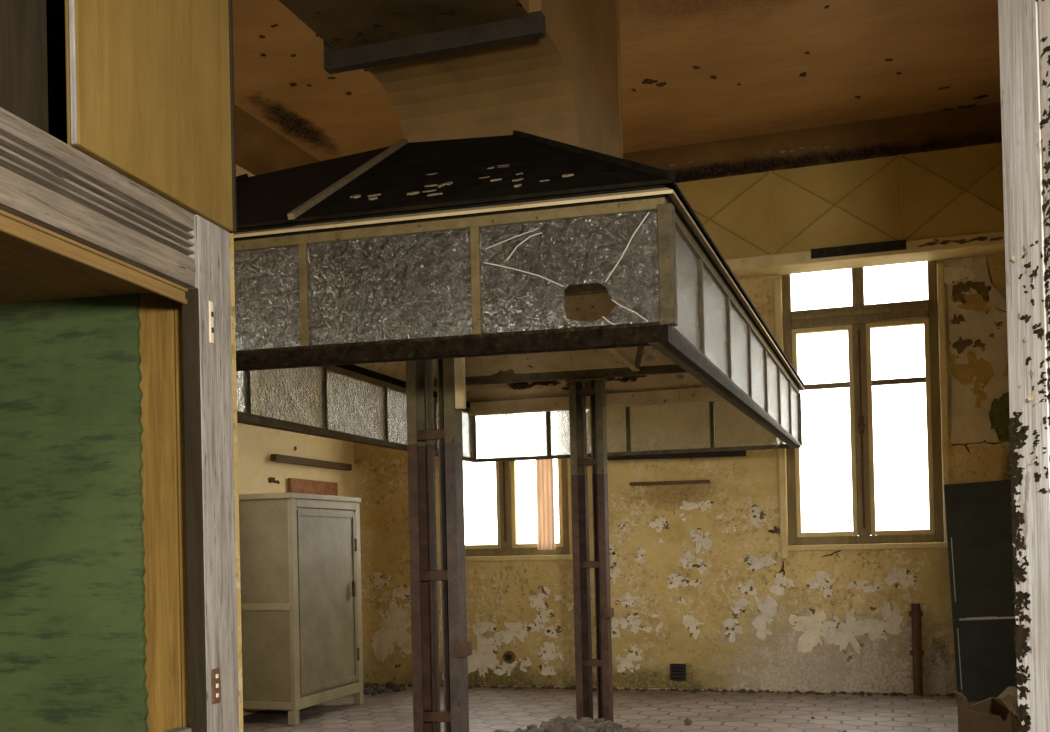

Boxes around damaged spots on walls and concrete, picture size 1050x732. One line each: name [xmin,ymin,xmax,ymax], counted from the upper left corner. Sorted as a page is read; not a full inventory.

peeling [918,237,1003,247]
flaking render [942,36,1050,732]
peeling [370,572,412,668]
peeling [468,586,574,681]
peeling [609,544,621,584]
peeling [611,592,663,676]
peeling [649,500,737,639]
peeling [748,503,780,535]
peeling [722,553,917,662]